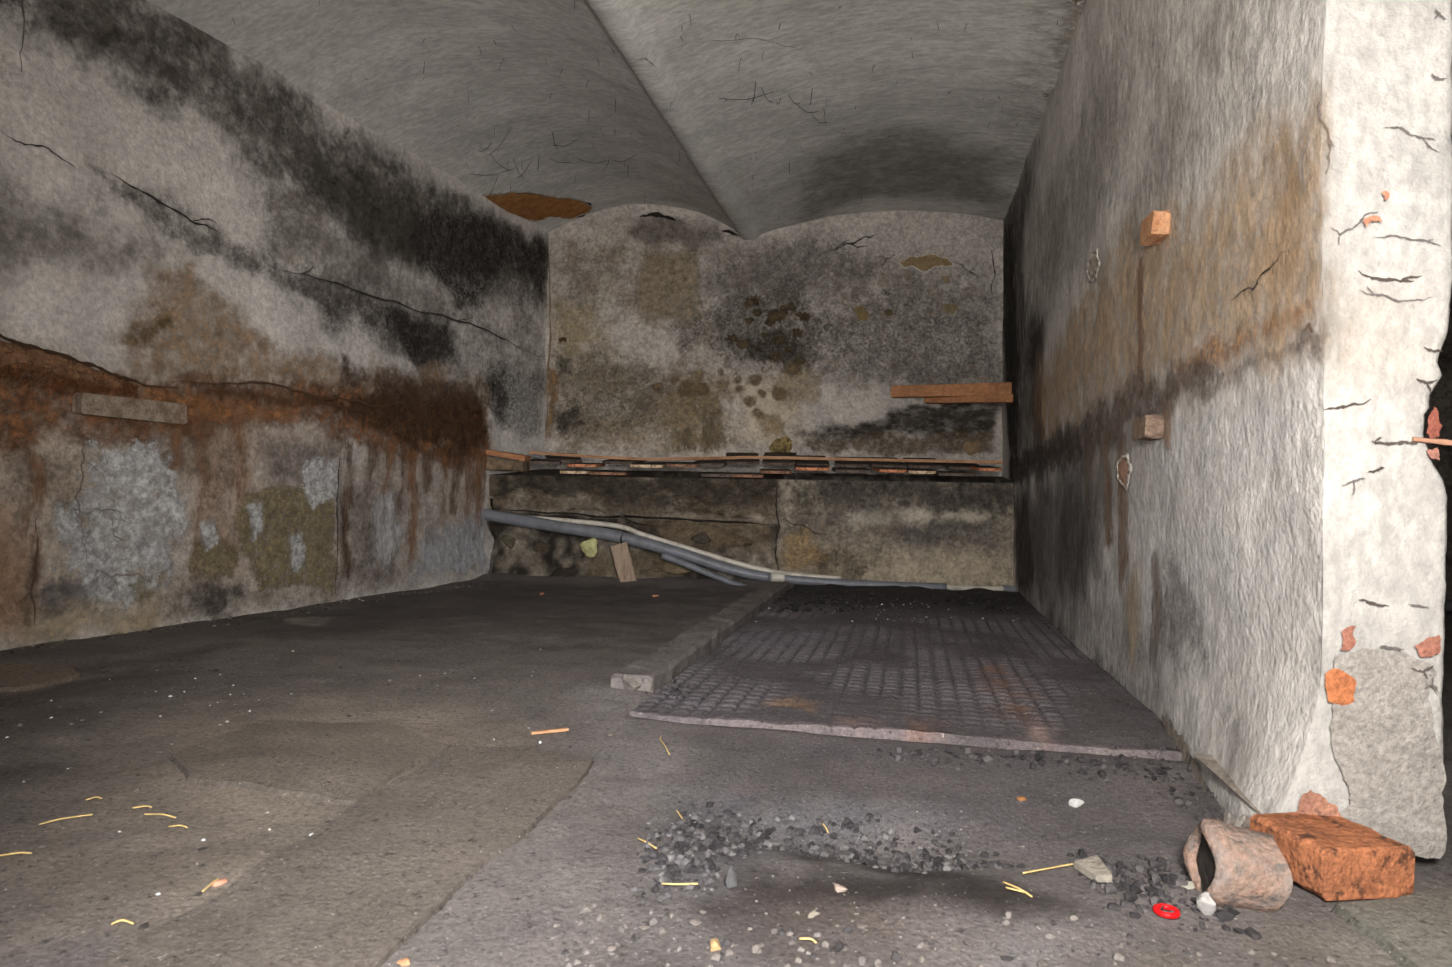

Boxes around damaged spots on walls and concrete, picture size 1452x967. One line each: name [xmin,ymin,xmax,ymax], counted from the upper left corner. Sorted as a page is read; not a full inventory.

crack [1384,126,1440,153]
flaking render [482,190,593,222]
crack [1331,212,1440,302]
water stain [128,265,731,454]
water stain [635,243,1000,401]
crack [1323,399,1371,410]
crack [1417,347,1442,393]
water stain [1438,338,1452,366]
corrosion [0,351,490,578]
crack [1342,437,1422,496]
water stain [1009,360,1241,688]
flaking render [1295,626,1447,859]